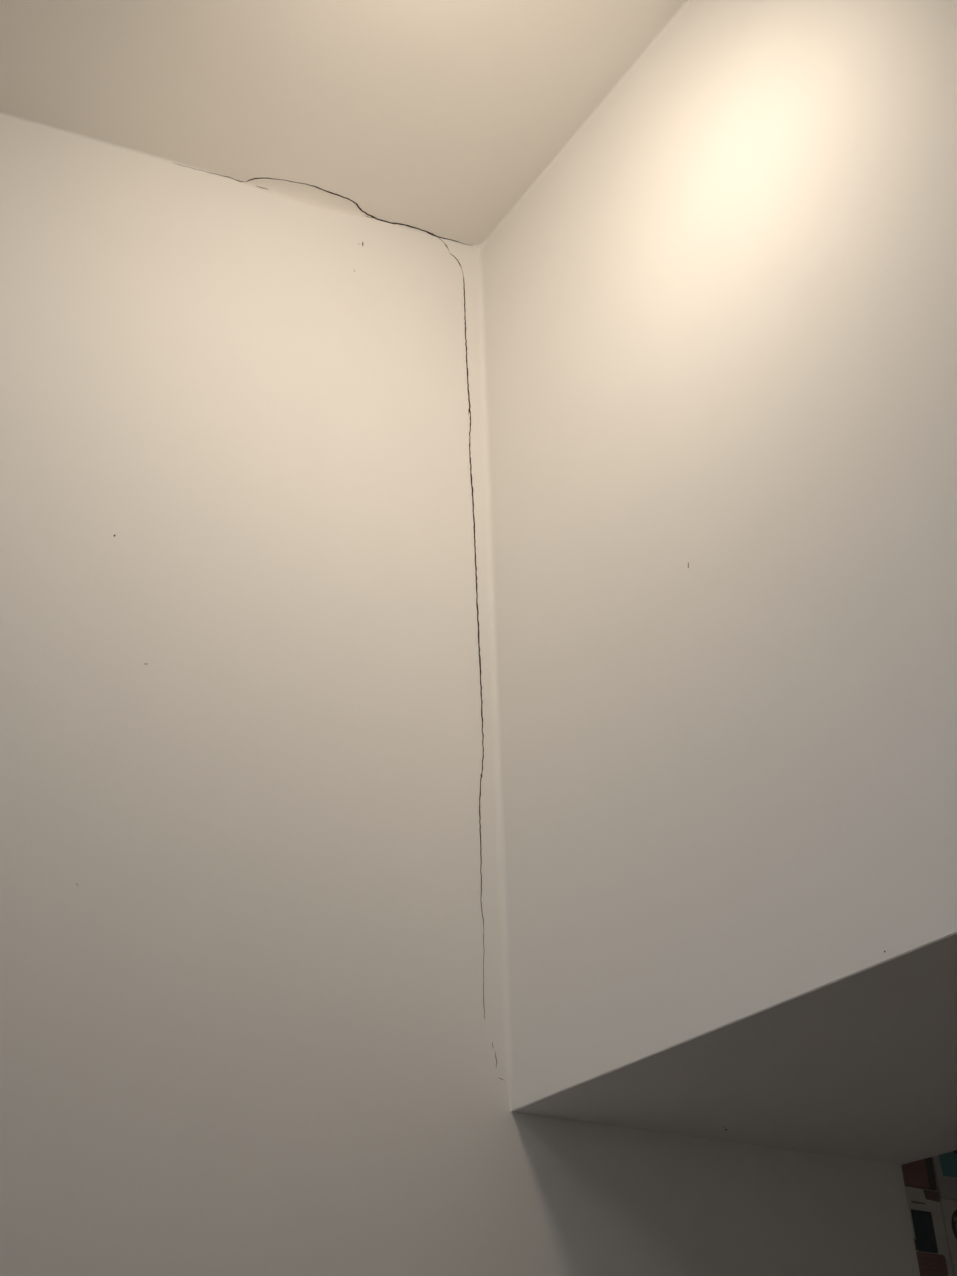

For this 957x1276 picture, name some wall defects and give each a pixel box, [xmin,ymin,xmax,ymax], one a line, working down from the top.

crack [174,163,503,1080]